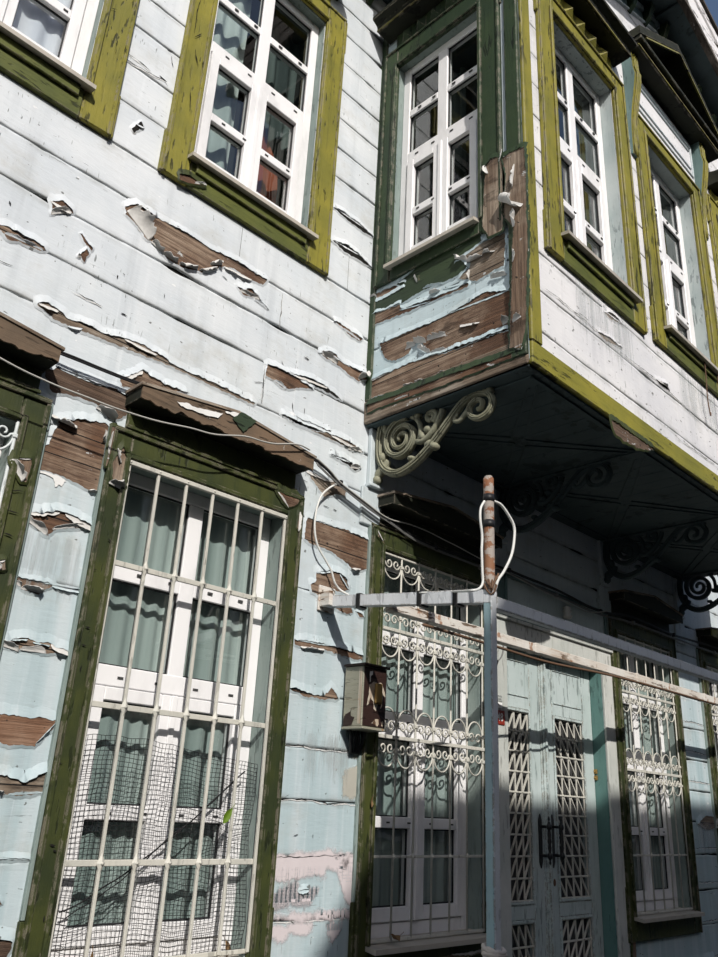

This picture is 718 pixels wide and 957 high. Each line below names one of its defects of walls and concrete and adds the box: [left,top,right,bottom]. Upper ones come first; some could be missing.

peeling [47,193,77,217]
peeling [0,217,50,254]
peeling [121,197,270,311]
peeling [318,142,531,415]
peeling [7,294,258,495]
peeling [263,358,343,402]
peeling [279,406,364,473]
peeling [305,467,349,500]
peeling [275,485,387,598]
peeling [2,629,69,657]
peeling [0,702,56,749]
peeling [0,925,16,957]